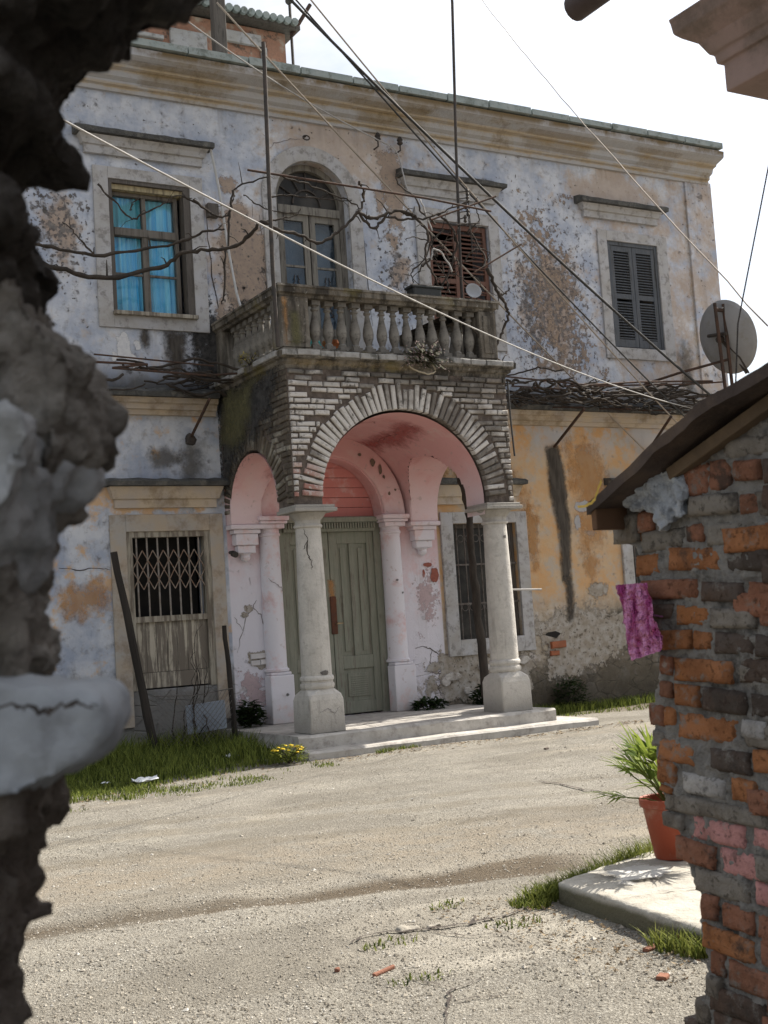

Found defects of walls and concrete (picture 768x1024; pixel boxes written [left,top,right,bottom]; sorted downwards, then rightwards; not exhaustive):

flaking render [374,149,409,279]
flaking render [502,181,609,392]
peeling [396,563,440,626]
flaking render [423,645,491,703]
water stain [546,446,574,621]
flaking render [518,582,627,690]